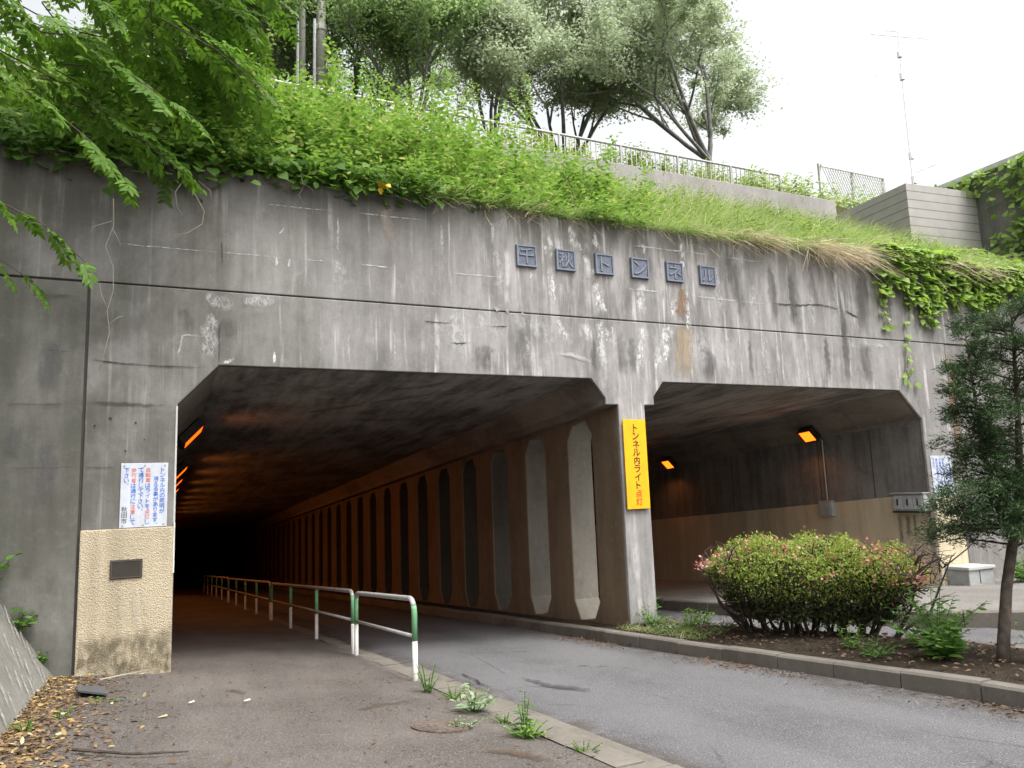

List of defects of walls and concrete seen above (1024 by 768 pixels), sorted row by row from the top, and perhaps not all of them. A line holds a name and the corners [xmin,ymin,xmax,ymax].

rust [676,290,686,315]
leakage [789,277,815,323]
crack [778,303,858,318]
leakage [583,323,615,362]
leakage [634,327,672,369]
leakage [843,318,882,374]